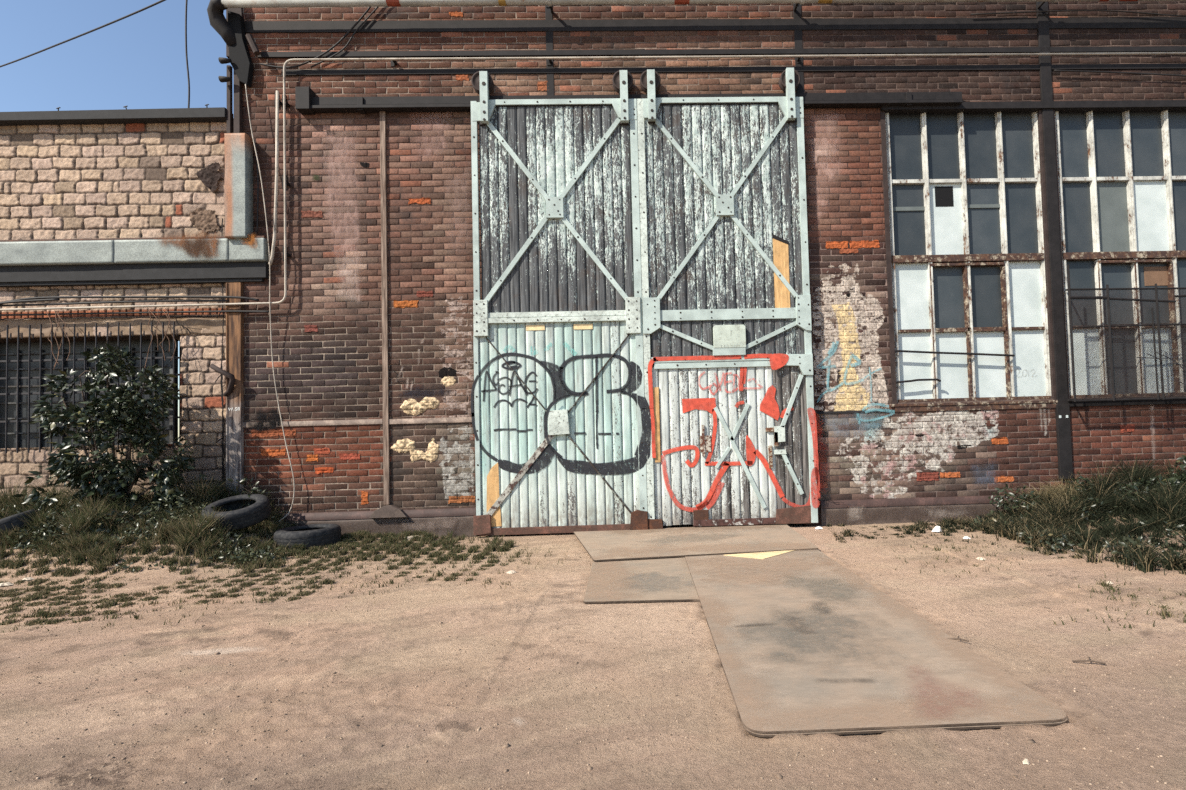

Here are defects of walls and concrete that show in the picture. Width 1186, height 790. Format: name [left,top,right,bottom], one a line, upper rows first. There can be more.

corrosion [162,234,217,256]
peeling [811,240,1009,499]